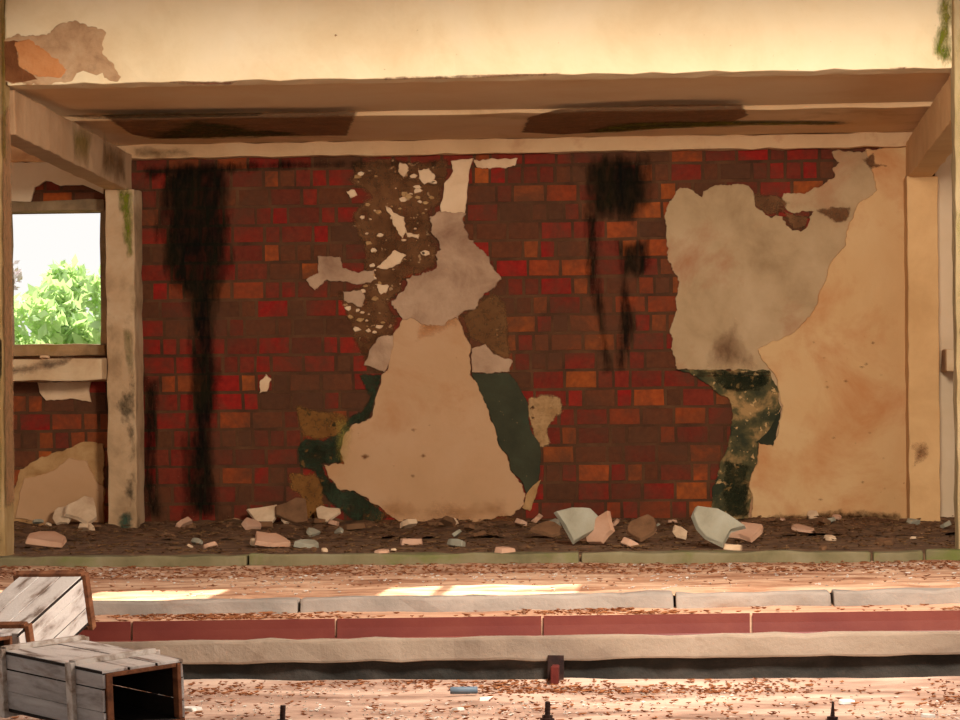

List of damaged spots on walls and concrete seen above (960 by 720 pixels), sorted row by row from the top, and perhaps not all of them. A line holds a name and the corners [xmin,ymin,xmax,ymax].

spalling [4,20,121,85]
peeling [14,442,106,525]
peeling [120,514,131,528]
water stain [144,380,159,516]
water stain [147,163,258,516]
peeling [259,375,271,393]
peeling [289,158,562,522]
water stain [587,157,645,328]
water stain [604,242,646,368]
peeling [664,147,907,521]